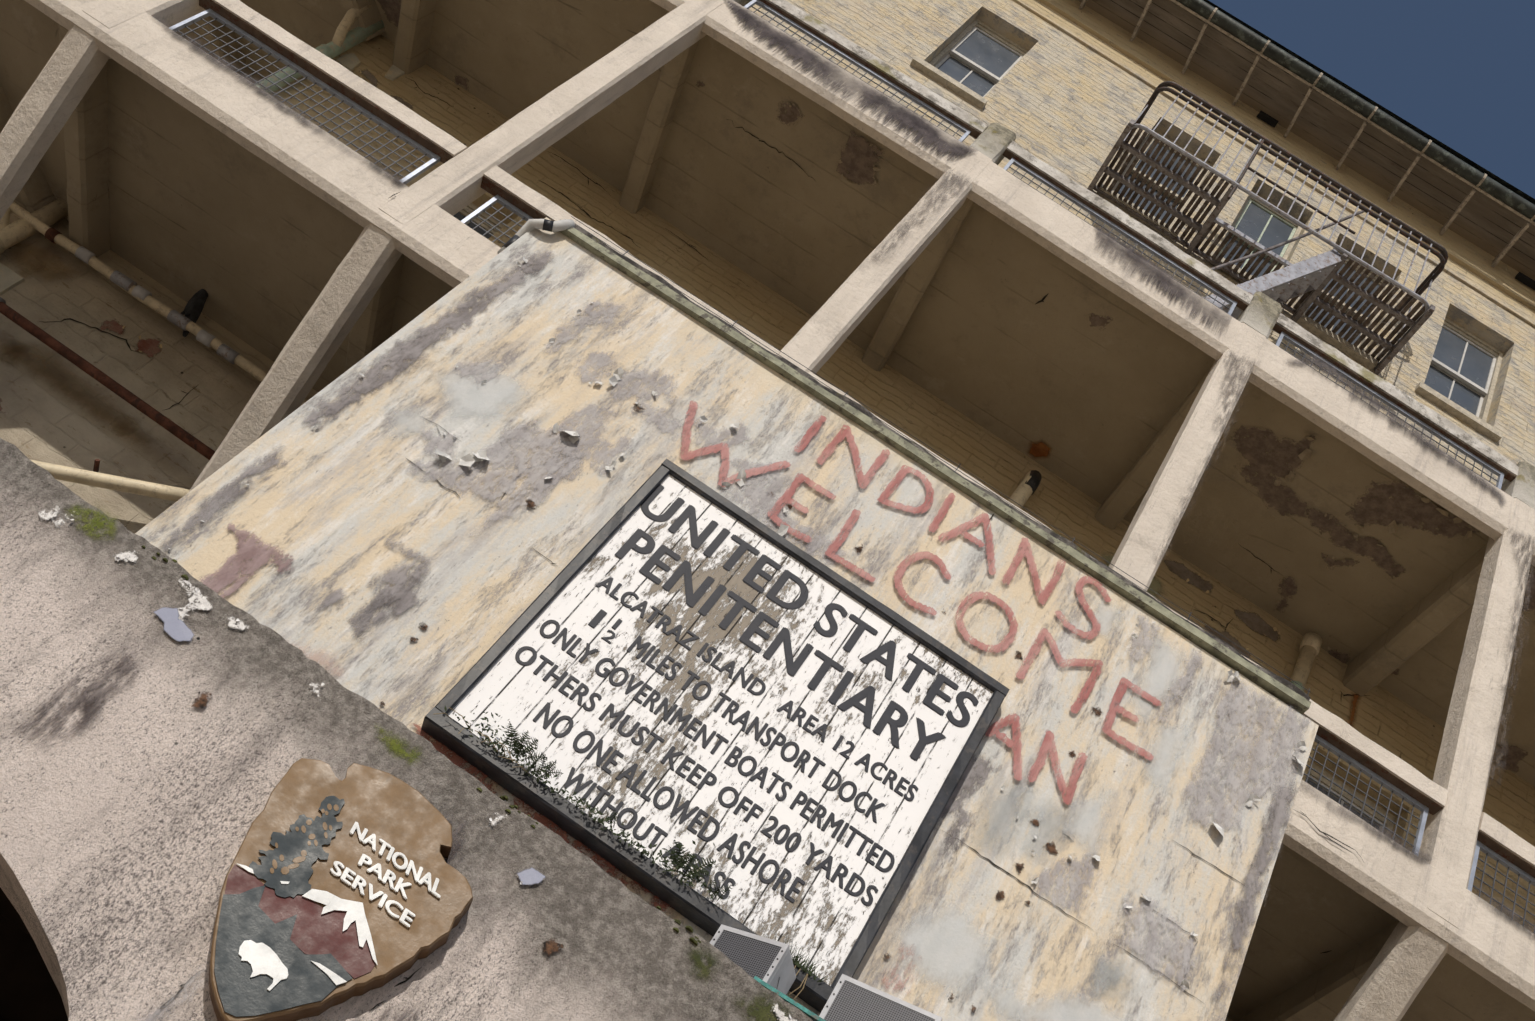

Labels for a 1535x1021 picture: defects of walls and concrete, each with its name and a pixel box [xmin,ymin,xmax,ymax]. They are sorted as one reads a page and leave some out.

water stain [727,0,974,257]
crack [40,318,140,353]
peeling [547,301,620,352]
water stain [1096,226,1226,326]
peeling [410,352,673,535]
peeling [695,415,863,563]
peeling [1226,425,1478,579]
peeling [1522,573,1535,611]